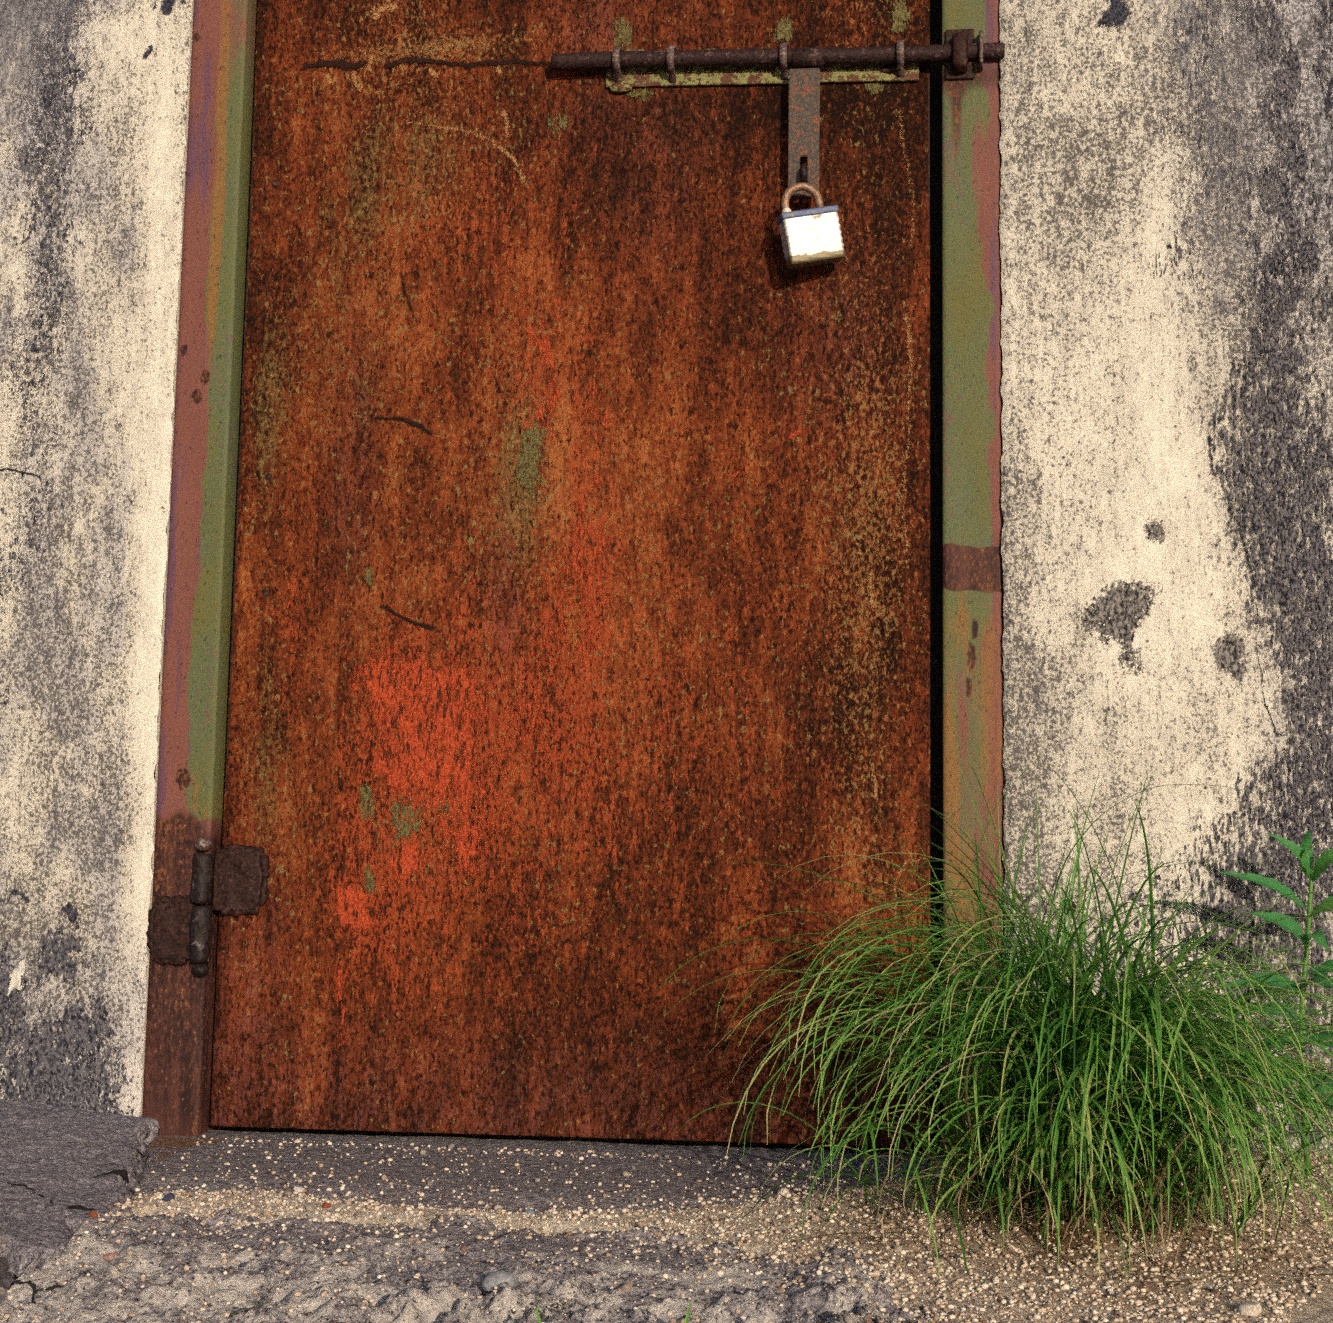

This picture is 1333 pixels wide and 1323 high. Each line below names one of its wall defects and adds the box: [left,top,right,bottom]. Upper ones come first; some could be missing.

water stain [0,0,109,621]
water stain [1150,0,1256,312]